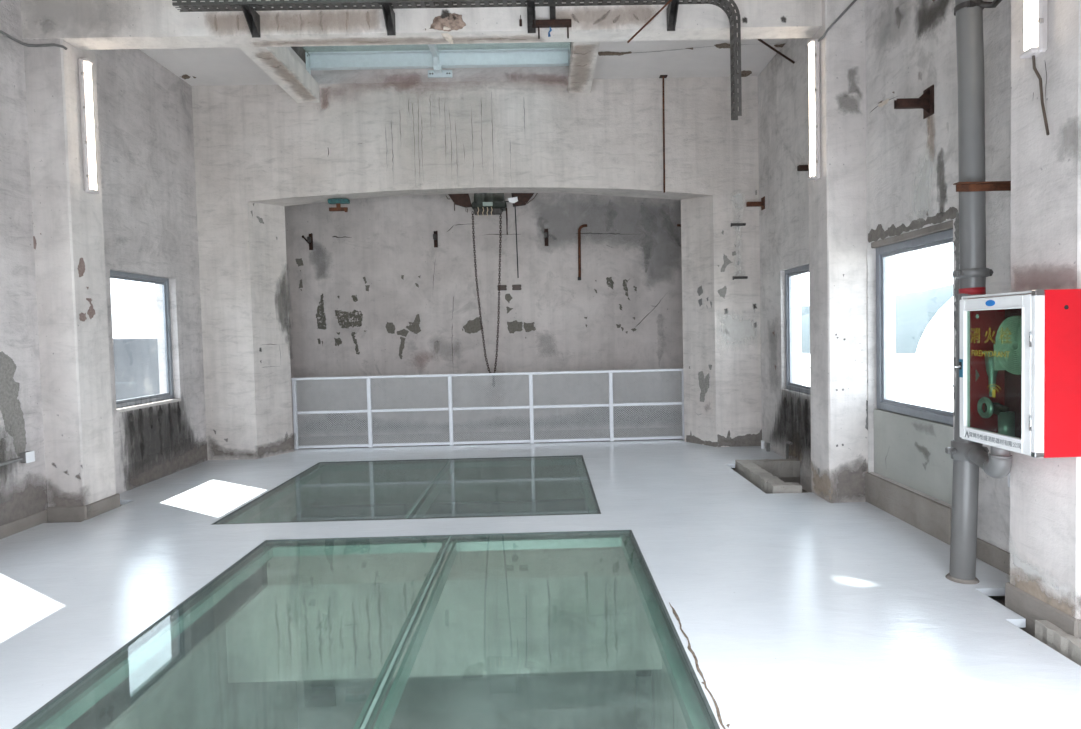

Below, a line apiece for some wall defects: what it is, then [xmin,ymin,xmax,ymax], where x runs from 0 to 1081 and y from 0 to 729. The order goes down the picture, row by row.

damp [918,0,948,36]
peeling [316,277,370,354]
peeling [386,314,421,359]
peeling [462,317,482,334]
peeling [505,294,536,338]
damp [124,398,447,490]
damp [460,392,866,501]